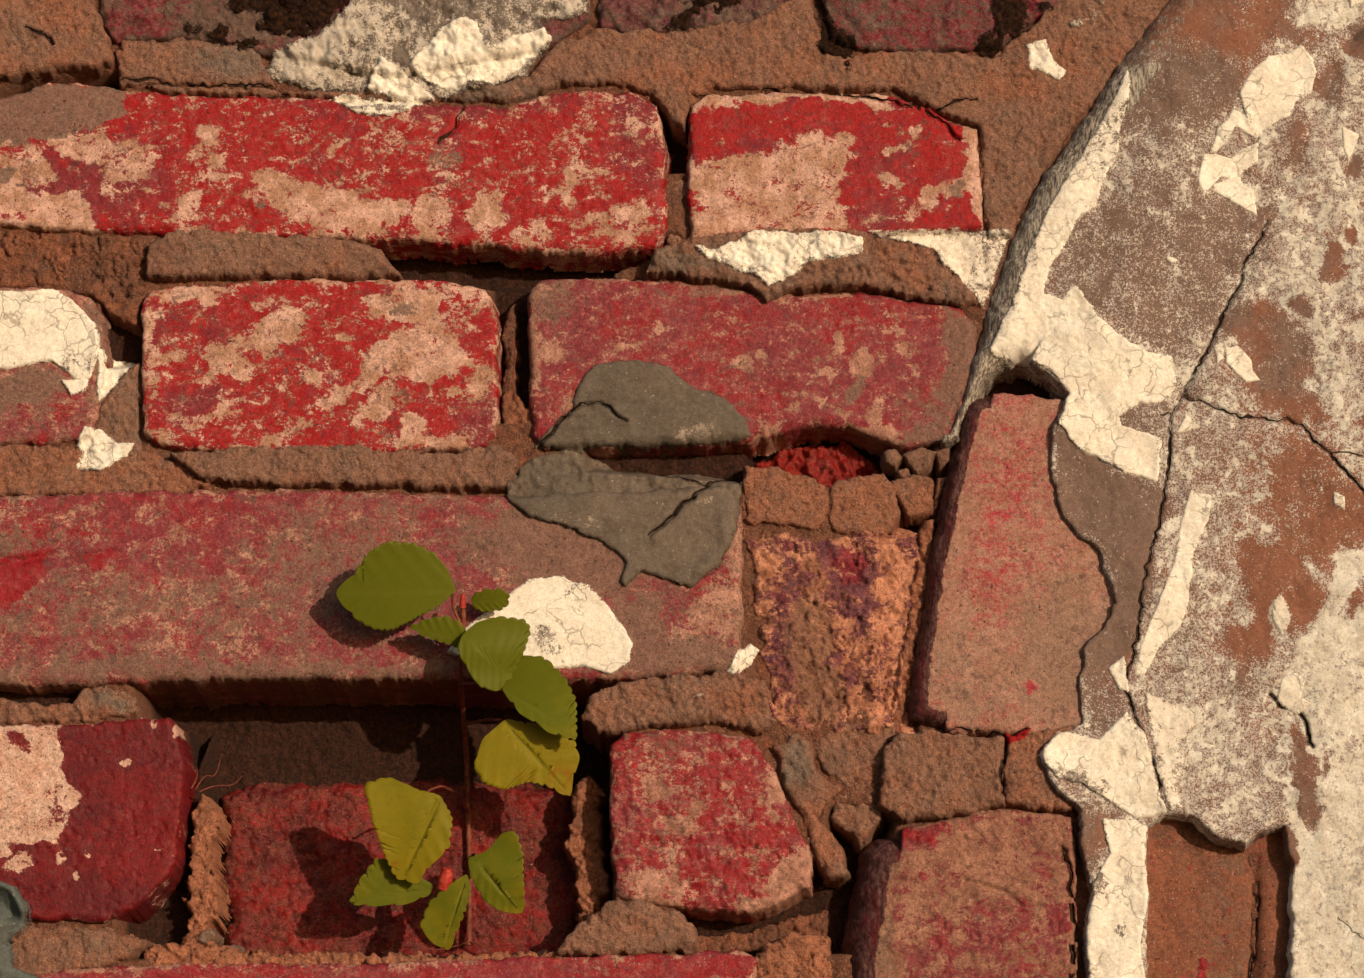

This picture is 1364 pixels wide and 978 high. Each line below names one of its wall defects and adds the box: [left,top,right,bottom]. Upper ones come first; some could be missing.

peeling [330,17,552,117]
peeling [1026,39,1066,80]
peeling [1198,45,1317,215]
peeling [1341,126,1359,162]
peeling [989,70,1193,482]
peeling [1213,342,1260,383]
crack [1125,221,1364,798]
peeling [1333,492,1345,510]
peeling [1272,595,1289,635]
peeling [1275,672,1311,715]
peeling [1039,490,1212,978]